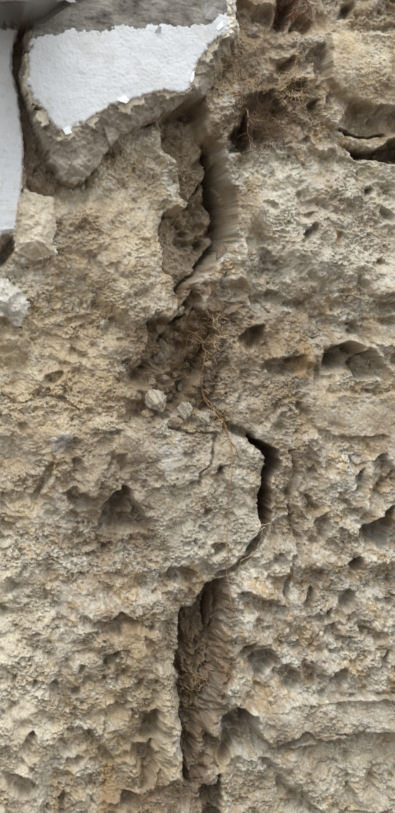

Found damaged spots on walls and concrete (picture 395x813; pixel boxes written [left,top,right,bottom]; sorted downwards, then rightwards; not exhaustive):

spalling [18,0,240,189]
crack [137,101,304,813]